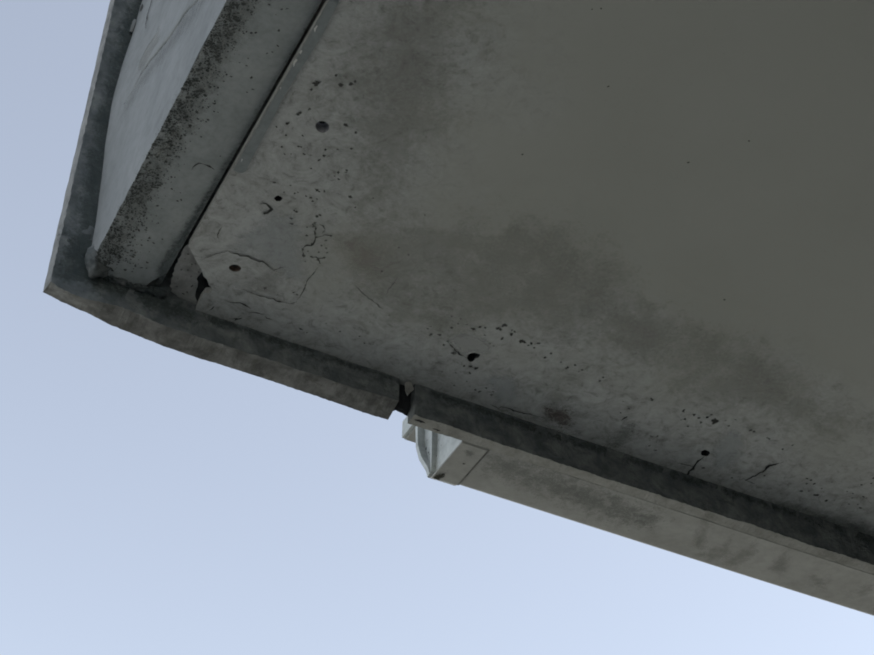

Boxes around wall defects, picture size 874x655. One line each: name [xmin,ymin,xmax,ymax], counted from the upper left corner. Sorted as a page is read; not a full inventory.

damp [56,0,257,322]
crack [206,227,284,270]
crack [239,223,330,304]